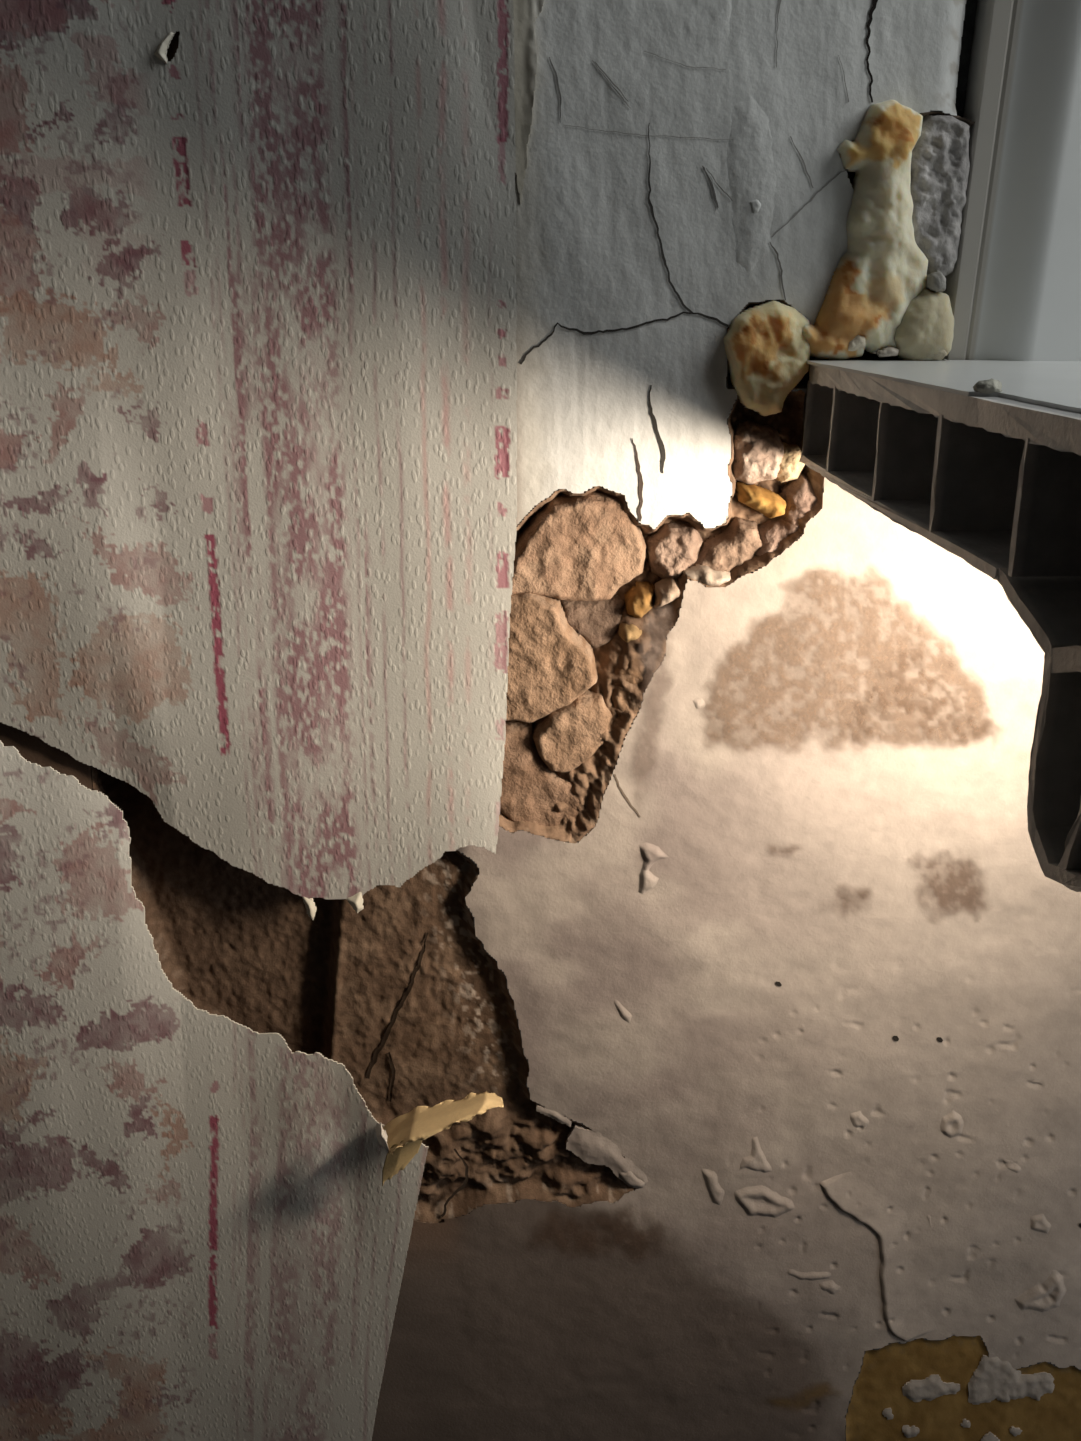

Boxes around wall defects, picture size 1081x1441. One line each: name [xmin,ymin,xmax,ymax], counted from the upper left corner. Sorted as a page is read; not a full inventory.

crack [866,0,878,103]
spalling [920,112,975,128]
crack [519,123,729,364]
spalling [727,300,791,333]
crack [770,242,786,300]
crack [632,385,666,522]
spalling [499,350,902,843]
leakage [707,571,991,749]
spalling [638,842,669,894]
spalling [89,766,648,1223]
spalling [701,1136,795,1218]
peeling [819,1171,1081,1441]